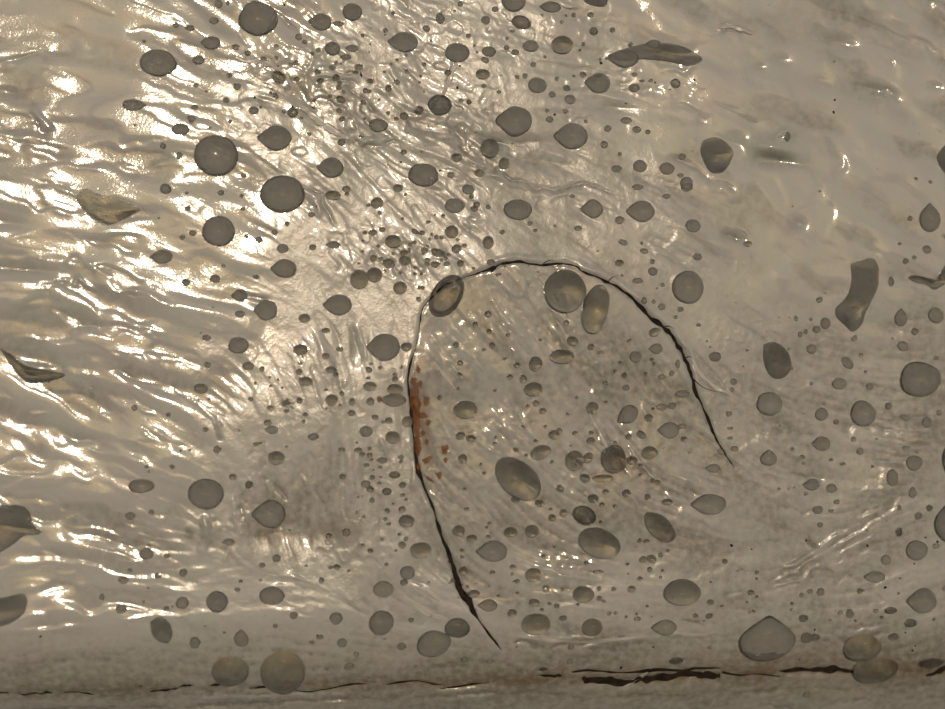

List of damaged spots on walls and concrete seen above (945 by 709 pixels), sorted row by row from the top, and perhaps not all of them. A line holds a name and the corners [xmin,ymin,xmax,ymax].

crack [460,260,734,467]
corrosion [410,366,441,482]
crack [407,299,501,650]
crack [540,665,853,687]
crack [926,666,945,676]
crack [150,683,220,692]
crack [296,683,363,692]
crack [387,680,489,689]
crack [0,689,94,697]